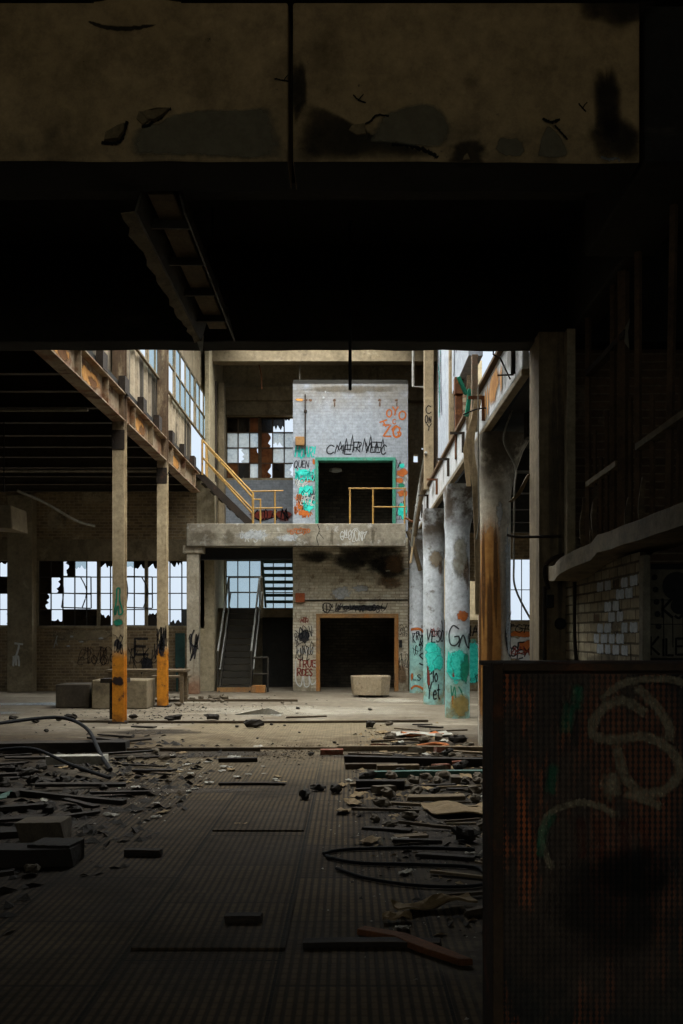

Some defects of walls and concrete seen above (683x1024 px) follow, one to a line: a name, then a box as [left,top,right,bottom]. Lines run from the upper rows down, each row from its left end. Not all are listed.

leakage [290,66,423,157]
flaking render [349,104,449,159]
corrosion [478,524,502,716]